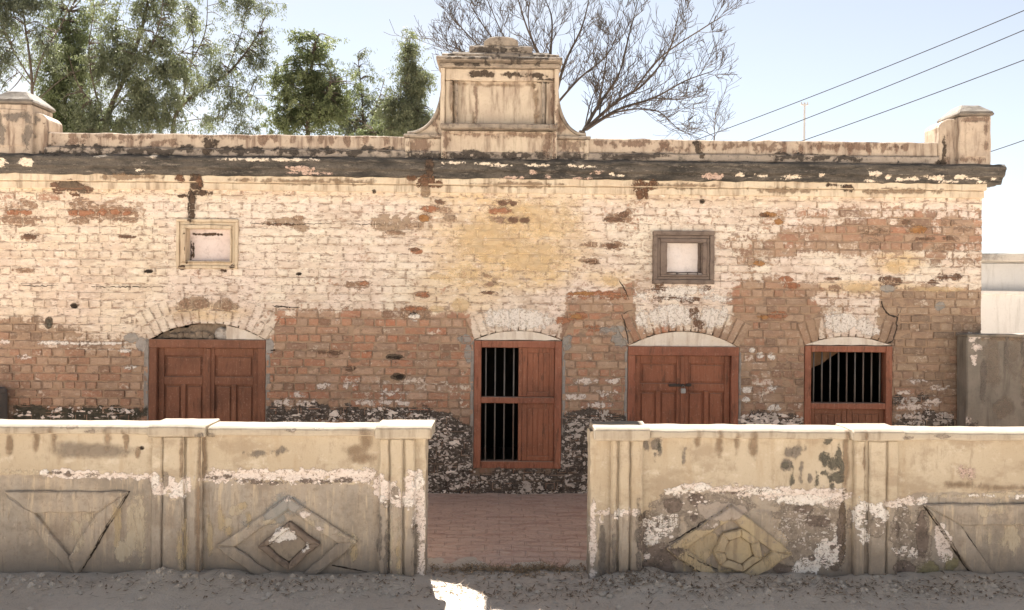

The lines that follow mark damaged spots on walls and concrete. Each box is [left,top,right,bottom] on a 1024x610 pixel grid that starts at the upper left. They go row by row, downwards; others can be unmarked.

peeling [50,179,139,239]
water stain [175,174,223,270]
water stain [201,136,220,156]
peeling [217,157,375,193]
water stain [692,140,705,159]
spalling [862,171,996,194]
crack [881,301,902,344]
water stain [643,438,662,456]
water stain [681,430,852,509]
peeling [372,469,426,569]
spalling [596,483,756,574]
spalling [763,489,953,575]